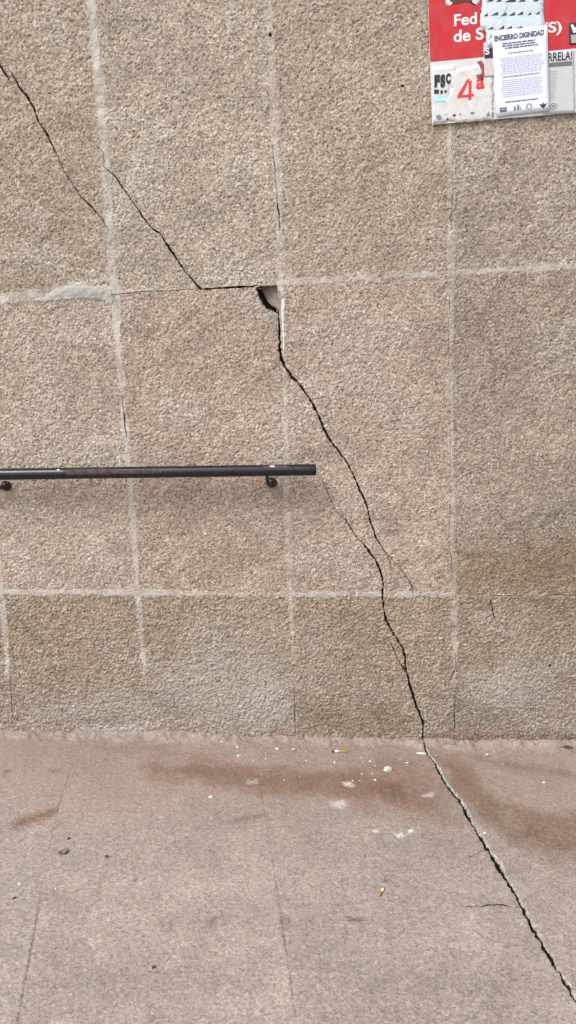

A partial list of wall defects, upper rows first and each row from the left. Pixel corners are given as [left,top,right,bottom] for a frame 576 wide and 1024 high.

spalling [254,285,282,335]
crack [0,63,430,740]
crack [448,654,457,739]